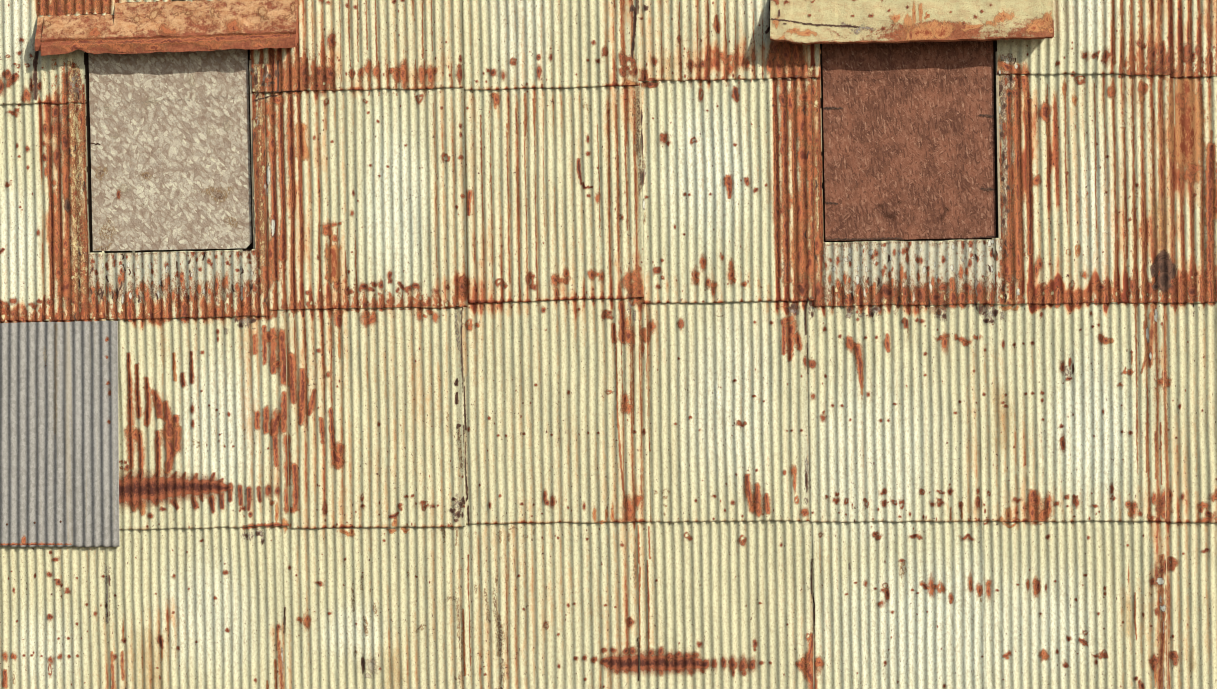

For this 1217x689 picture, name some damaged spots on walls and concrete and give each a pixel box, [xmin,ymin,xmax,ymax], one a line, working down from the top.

corrosion [0,0,1217,542]
corrosion [437,288,772,687]
corrosion [911,579,953,604]
corrosion [968,577,999,602]
corrosion [1017,569,1056,595]
corrosion [1122,564,1152,640]
corrosion [2,652,79,688]
corrosion [796,633,824,689]
corrosion [1134,634,1179,689]